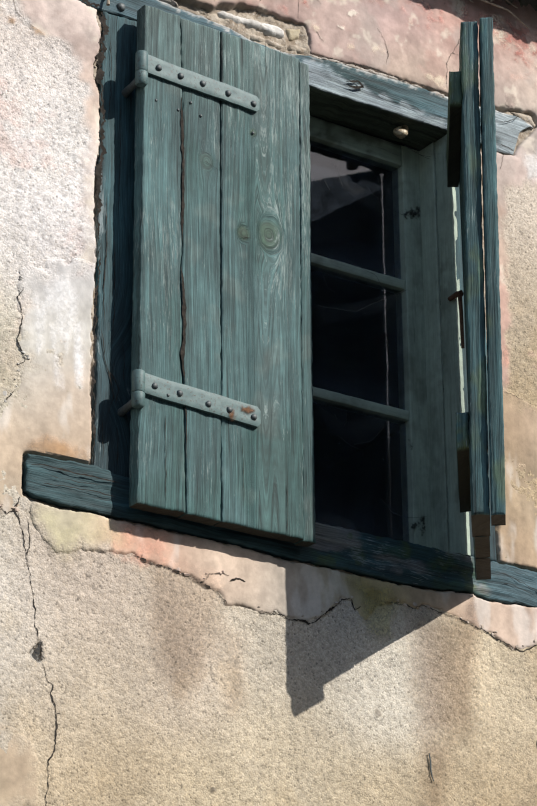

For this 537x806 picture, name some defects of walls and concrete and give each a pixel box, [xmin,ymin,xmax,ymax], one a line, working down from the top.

spalling [193,7,306,54]
peeling [481,15,537,63]
crack [17,289,26,364]
peeling [0,256,537,650]
crack [0,497,38,634]